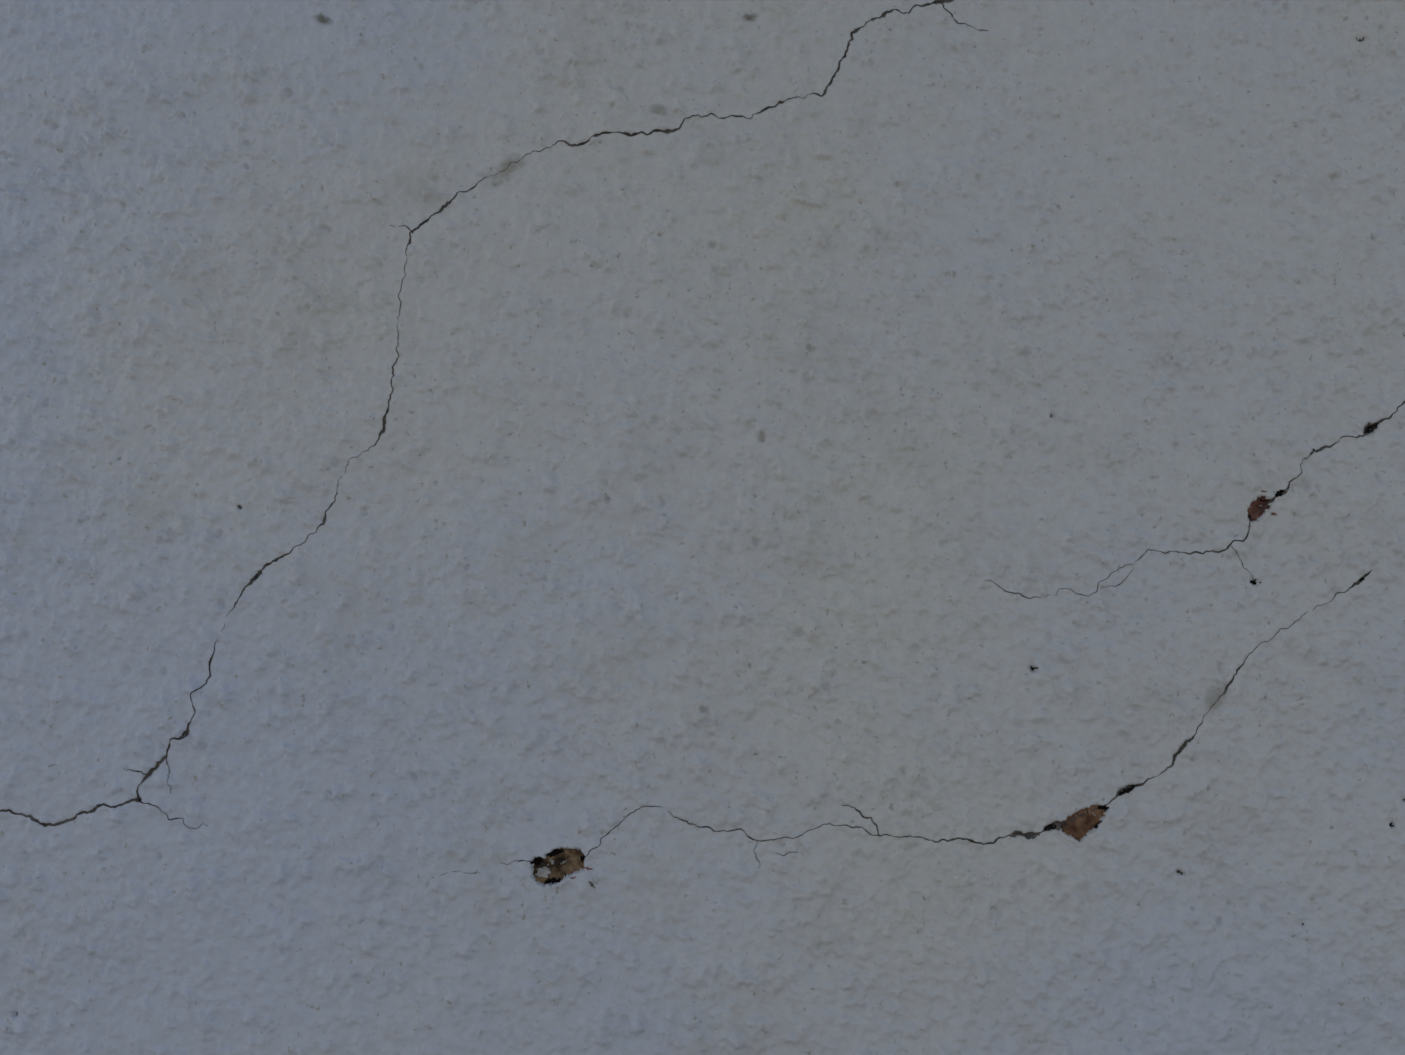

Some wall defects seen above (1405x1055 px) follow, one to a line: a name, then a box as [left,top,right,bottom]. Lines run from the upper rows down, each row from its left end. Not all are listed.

crack [0,0,988,829]
crack [985,401,1405,599]
spalling [1247,490,1277,521]
spalling [530,848,598,888]
crack [433,570,1372,878]
spalling [1062,805,1110,841]